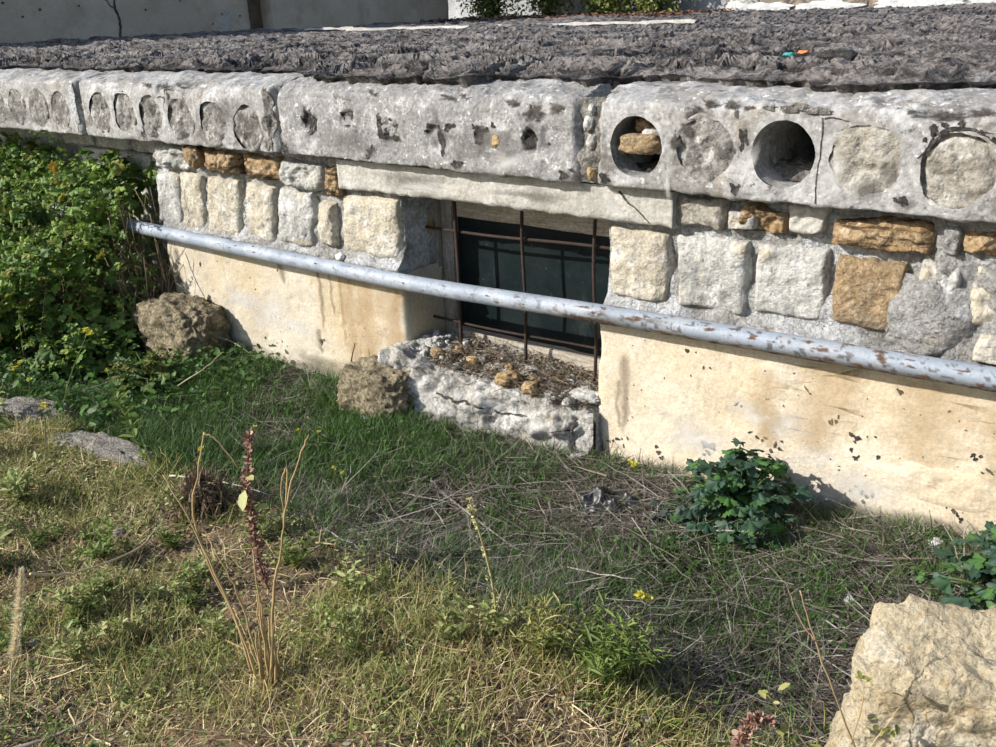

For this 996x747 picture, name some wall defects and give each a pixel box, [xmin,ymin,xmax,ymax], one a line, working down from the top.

crack [106,0,122,37]
spalling [300,107,317,135]
spalling [365,113,400,159]
spalling [424,123,455,157]
spalling [472,122,499,148]
spalling [520,104,550,149]
crack [814,117,849,204]
crack [618,190,650,224]
crack [436,392,526,420]
crack [549,420,577,453]